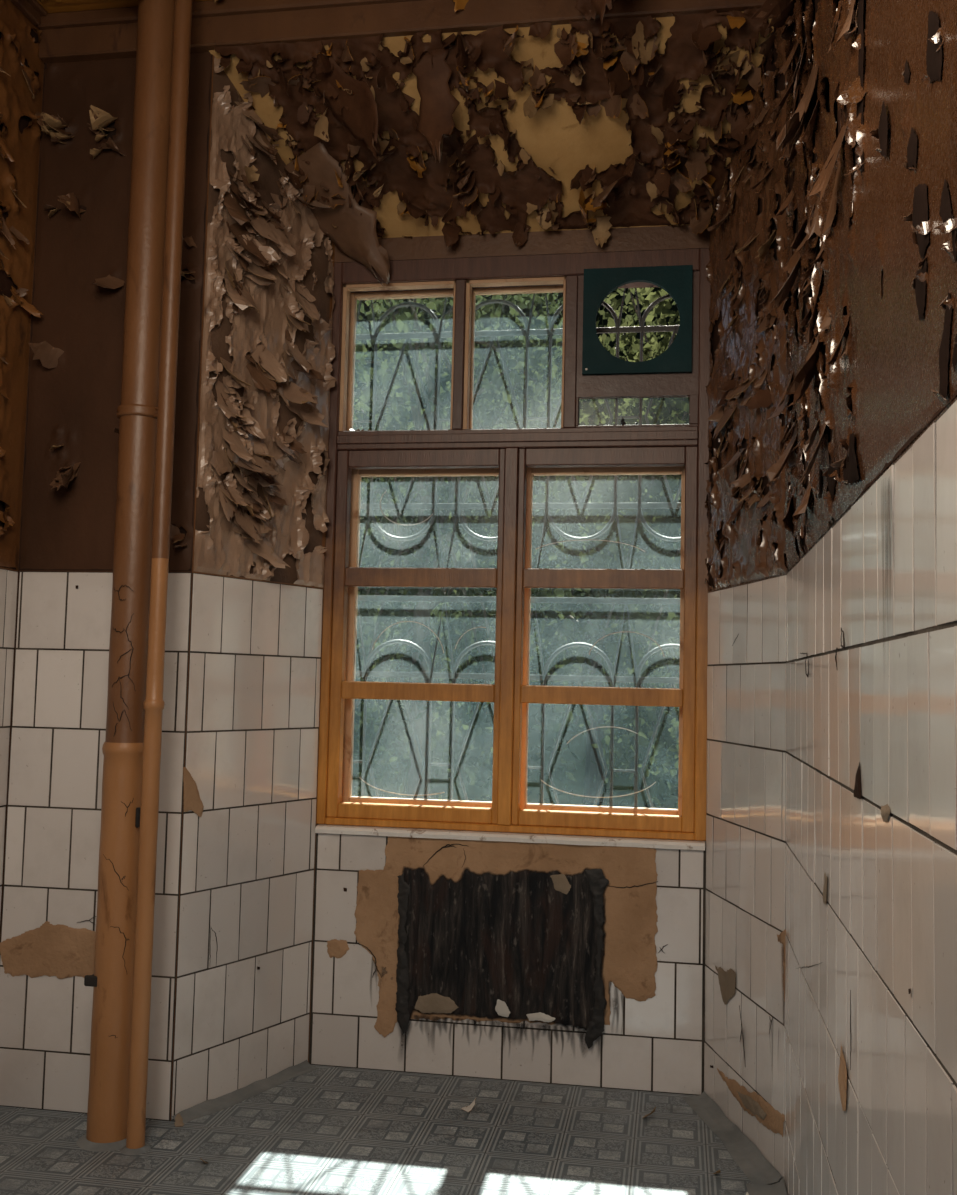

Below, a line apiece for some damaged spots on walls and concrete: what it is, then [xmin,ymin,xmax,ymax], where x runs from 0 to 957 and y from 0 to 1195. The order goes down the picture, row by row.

peeling [0,0,136,571]
peeling [168,0,957,591]
peeling [183,767,204,817]
peeling [0,921,96,979]
peeling [327,836,668,1038]
peeling [715,966,736,1004]
peeling [710,1065,785,1137]
peeling [838,1046,847,1112]